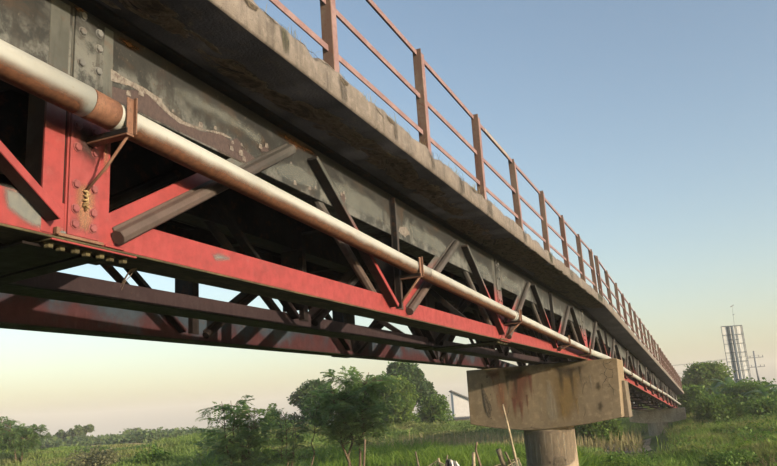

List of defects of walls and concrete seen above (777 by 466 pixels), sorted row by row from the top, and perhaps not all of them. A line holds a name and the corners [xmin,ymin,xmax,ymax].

peeling [111,69,269,163]
peeling [277,161,317,190]
peeling [6,189,41,227]
peeling [335,183,382,220]
peeling [398,226,446,253]
spalling [478,238,605,308]